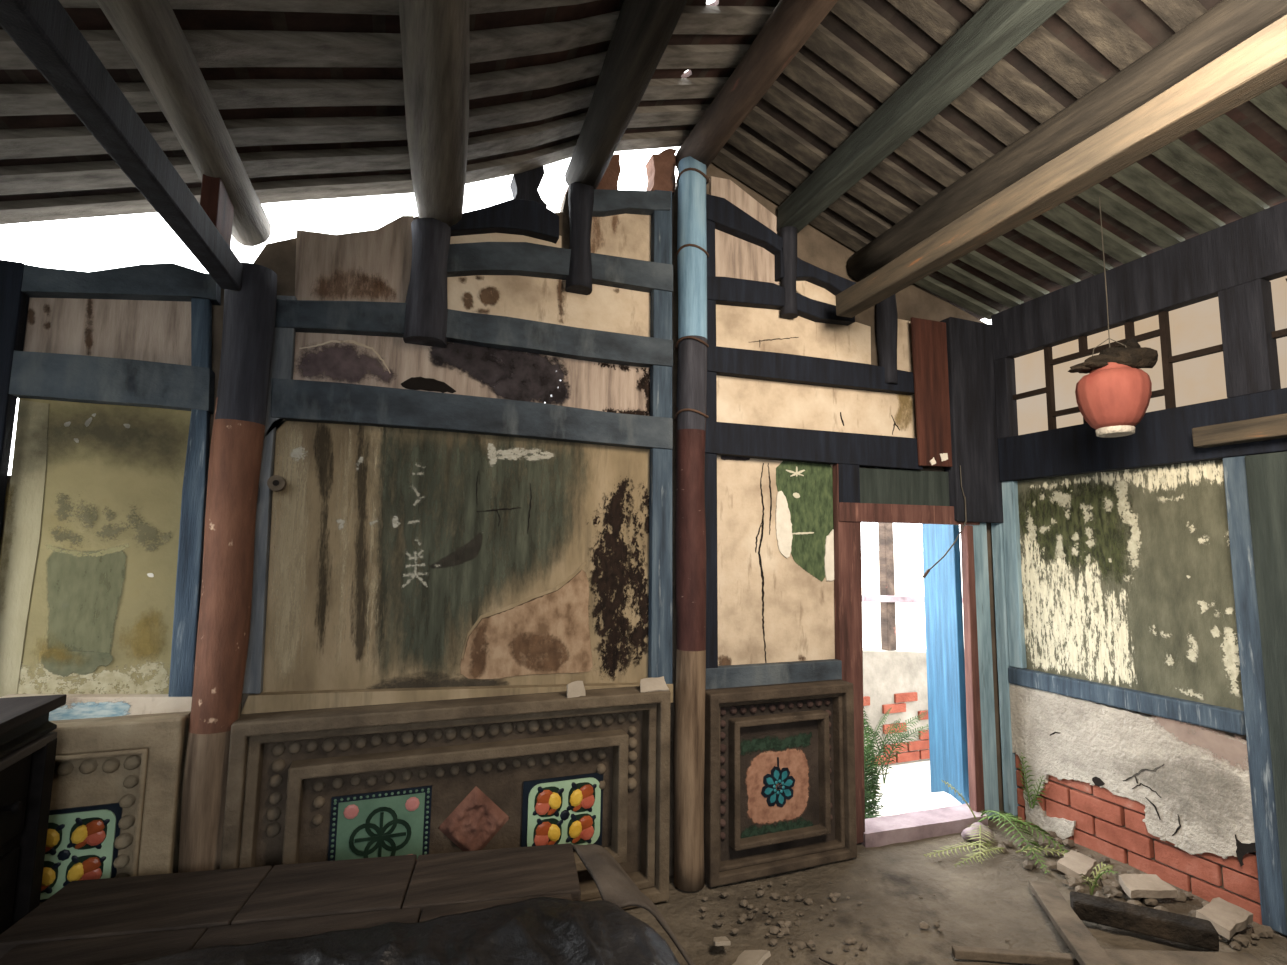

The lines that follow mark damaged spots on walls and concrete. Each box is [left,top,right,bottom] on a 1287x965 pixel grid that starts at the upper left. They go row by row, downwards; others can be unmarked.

damp [273,425,391,674]
damp [590,478,649,679]
crack [755,463,772,663]
damp [1018,479,1133,582]
peeling [1020,460,1230,686]
peeling [1197,600,1241,696]
spalling [1009,683,1262,925]
crack [1123,764,1181,836]